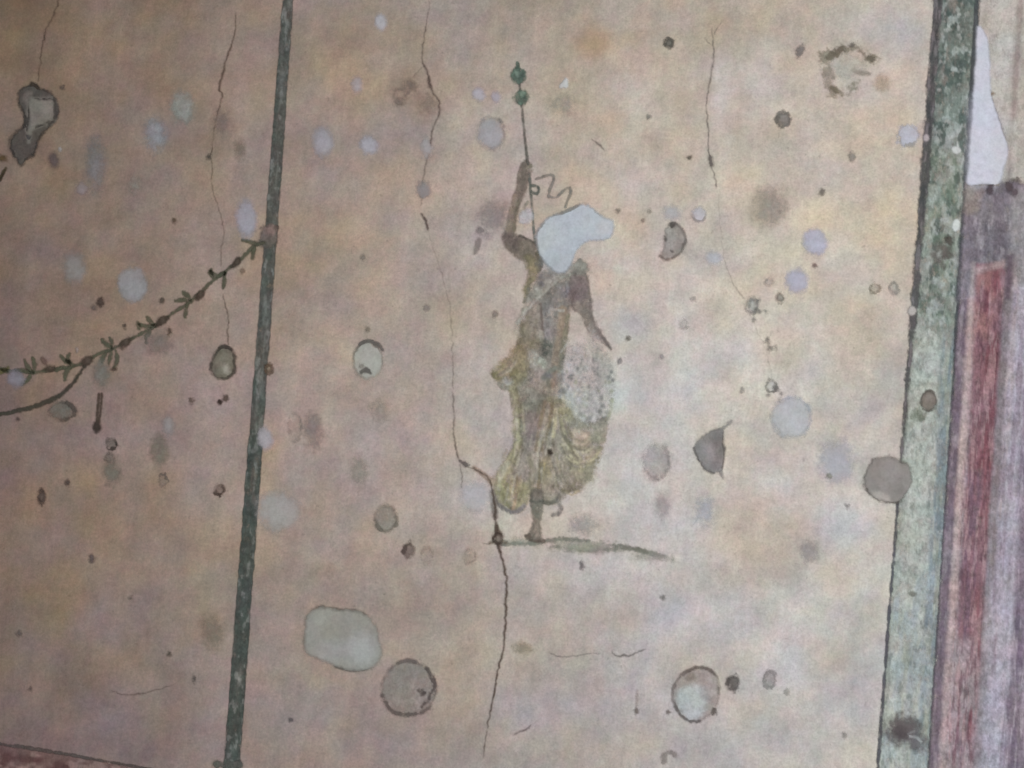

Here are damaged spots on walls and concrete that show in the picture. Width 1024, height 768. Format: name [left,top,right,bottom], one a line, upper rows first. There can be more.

crack [219,33,235,96]
damp [820,44,886,98]
spalling [11,82,64,165]
crack [455,444,508,747]